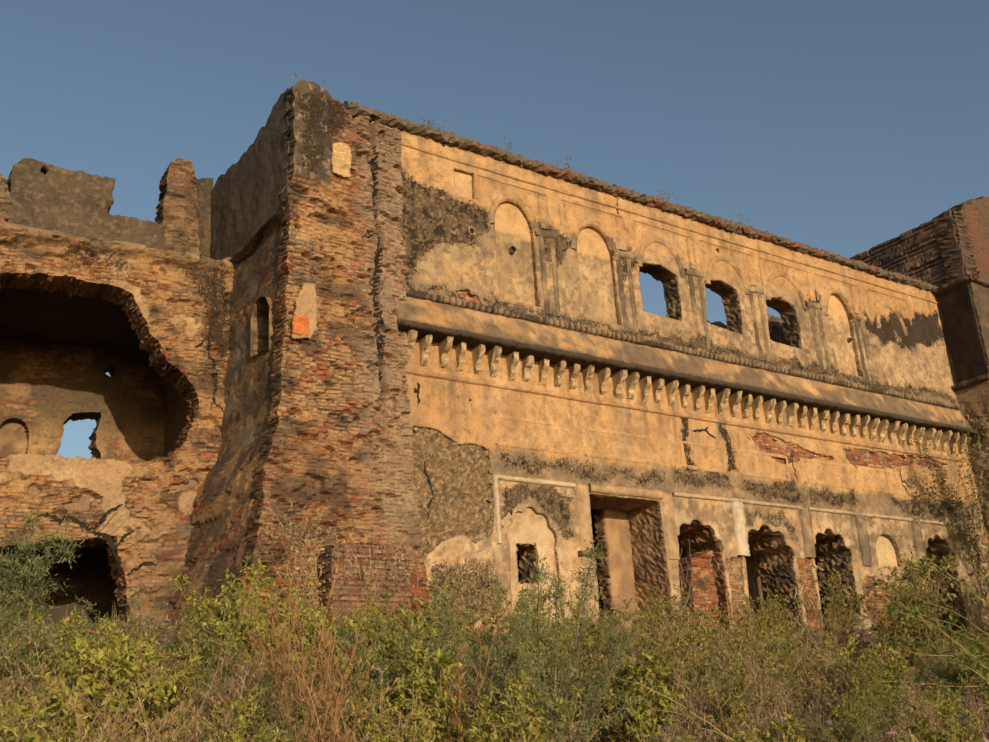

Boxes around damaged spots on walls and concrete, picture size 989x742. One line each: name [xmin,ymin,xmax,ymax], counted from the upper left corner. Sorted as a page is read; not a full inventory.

flaking render [291,282,319,339]
crack [367,146,388,407]
water stain [483,293,956,404]
water stain [853,284,989,384]
peeling [412,426,495,559]
water stain [497,417,862,545]
flaking render [747,433,832,464]
flaking render [843,447,944,469]